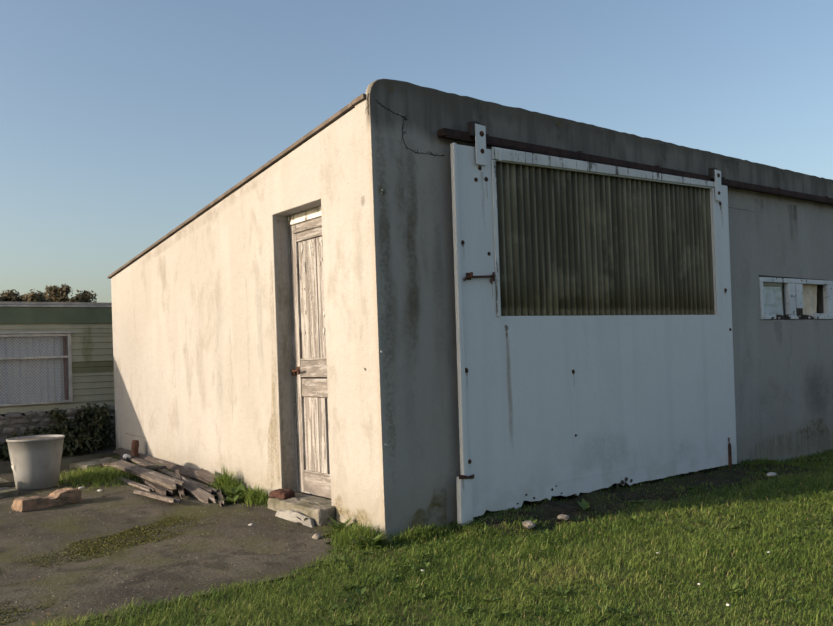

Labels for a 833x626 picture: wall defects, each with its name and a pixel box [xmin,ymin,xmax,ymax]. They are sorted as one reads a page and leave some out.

crack [365,96,445,156]